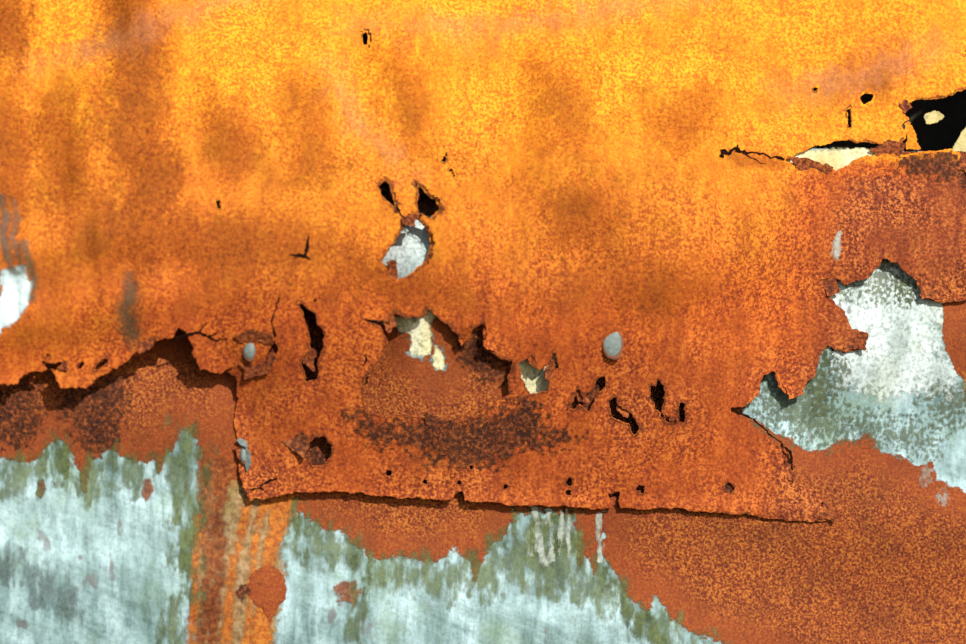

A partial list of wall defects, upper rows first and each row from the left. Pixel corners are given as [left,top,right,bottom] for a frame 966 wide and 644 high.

peeling [0,195,37,334]
rust [379,181,395,205]
peeling [382,206,431,279]
rust [417,188,439,220]
peeling [787,87,966,174]
rust [891,150,966,188]
rust [299,299,324,381]
peeling [384,310,445,370]
peeling [518,353,557,393]
peeling [820,259,964,404]
rust [942,300,966,382]
rust [0,314,966,644]